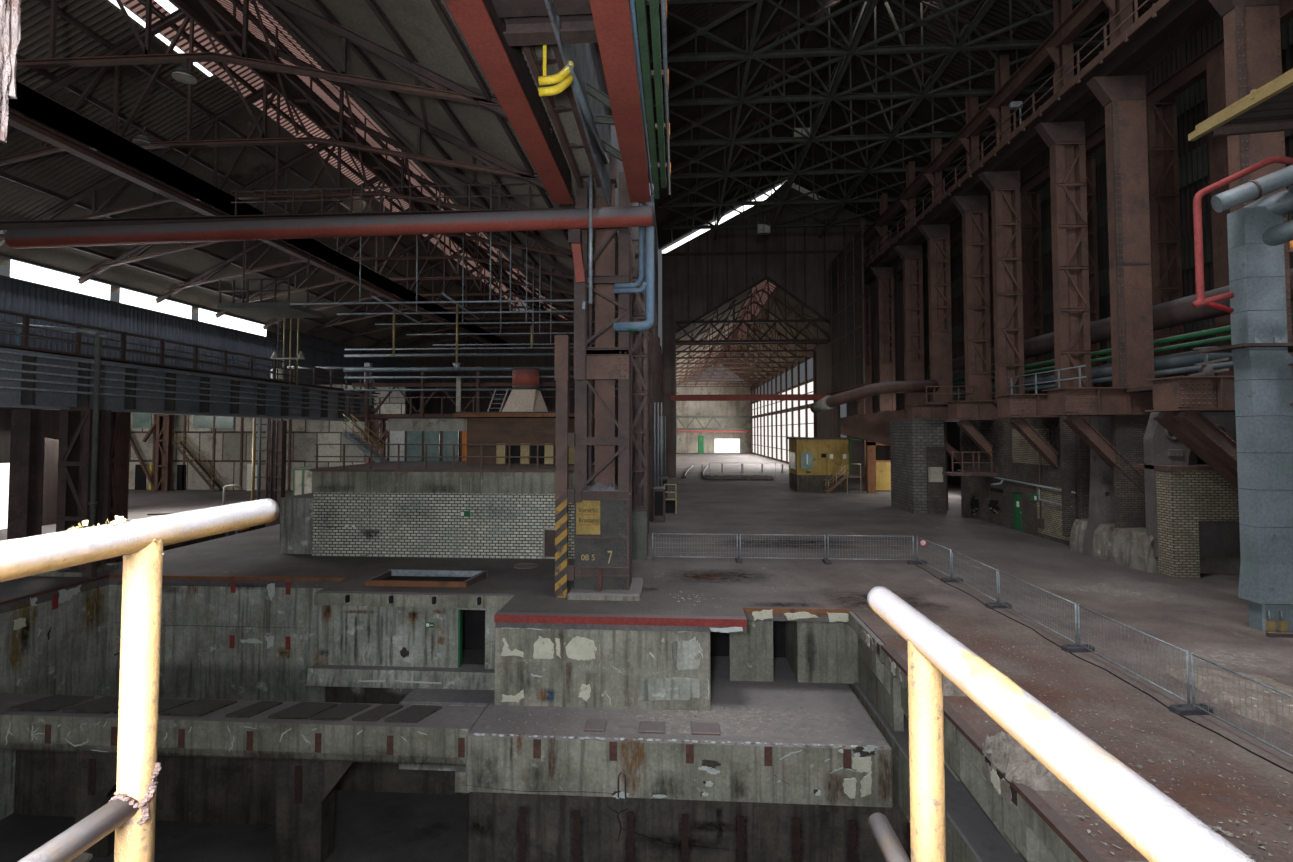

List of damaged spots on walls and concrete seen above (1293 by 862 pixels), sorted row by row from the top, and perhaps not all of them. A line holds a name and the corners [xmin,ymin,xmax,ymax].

spalling [710,609,849,633]
peeling [501,628,597,661]
peeling [638,631,710,701]
spalling [943,674,967,696]
spalling [981,731,1072,806]